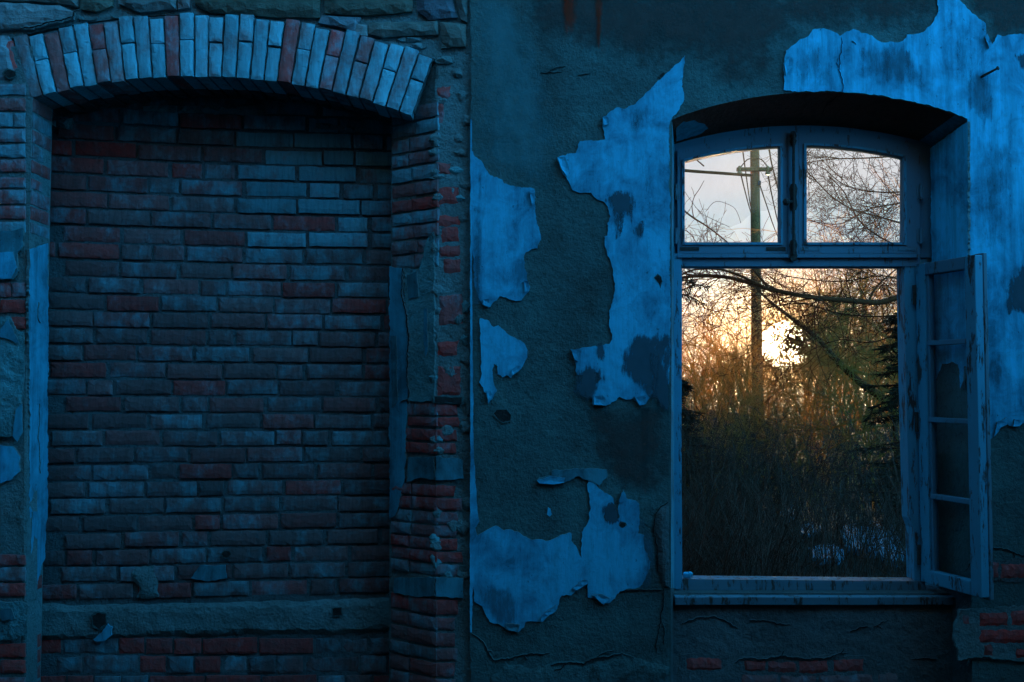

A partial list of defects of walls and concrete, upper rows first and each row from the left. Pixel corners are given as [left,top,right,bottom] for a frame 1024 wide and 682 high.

flaking render [0,228,49,584]
flaking render [388,79,650,632]
flaking render [557,56,708,406]
crack [821,38,856,116]
flaking render [783,0,1024,438]
crack [472,502,888,671]
flaking render [952,605,1024,661]